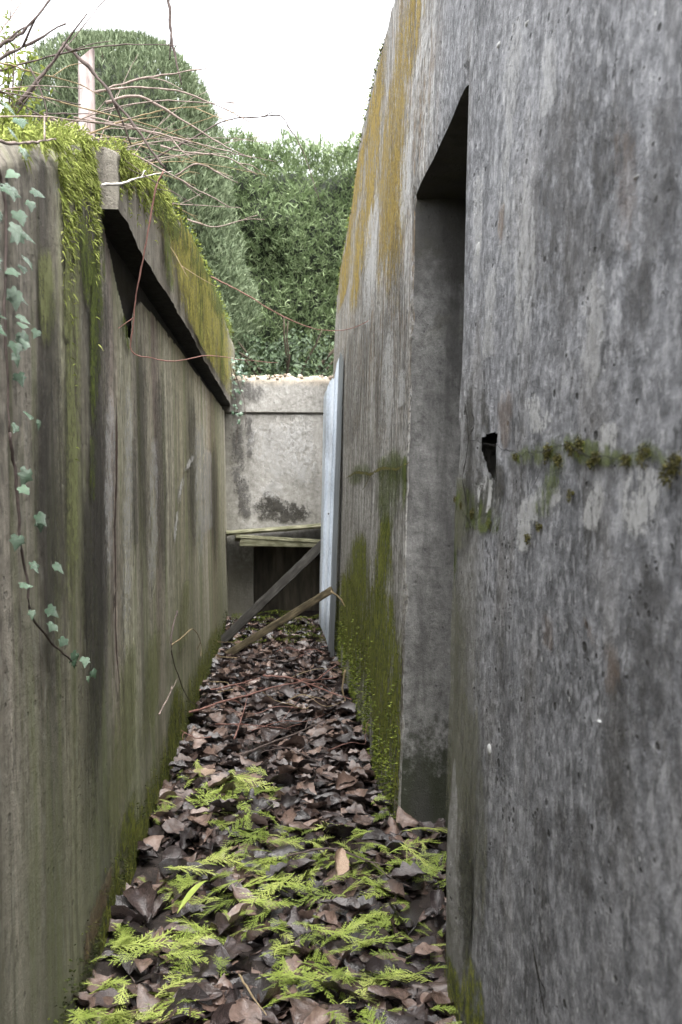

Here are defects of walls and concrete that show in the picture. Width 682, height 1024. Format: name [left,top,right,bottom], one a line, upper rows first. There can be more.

damp [39,216,131,787]
damp [241,381,264,400]
damp [232,417,310,523]
damp [335,333,407,825]